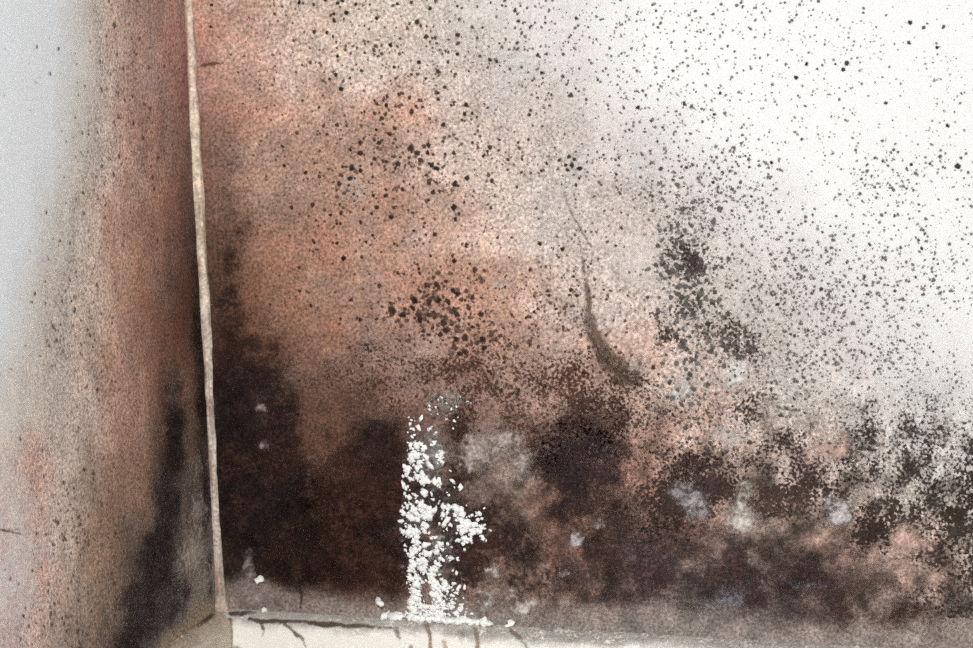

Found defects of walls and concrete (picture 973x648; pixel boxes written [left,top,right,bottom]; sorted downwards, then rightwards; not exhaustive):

water stain [584,2,752,114]
water stain [663,82,734,139]
water stain [732,0,829,87]
water stain [788,0,865,149]
water stain [849,139,951,240]
crack [229,589,392,640]